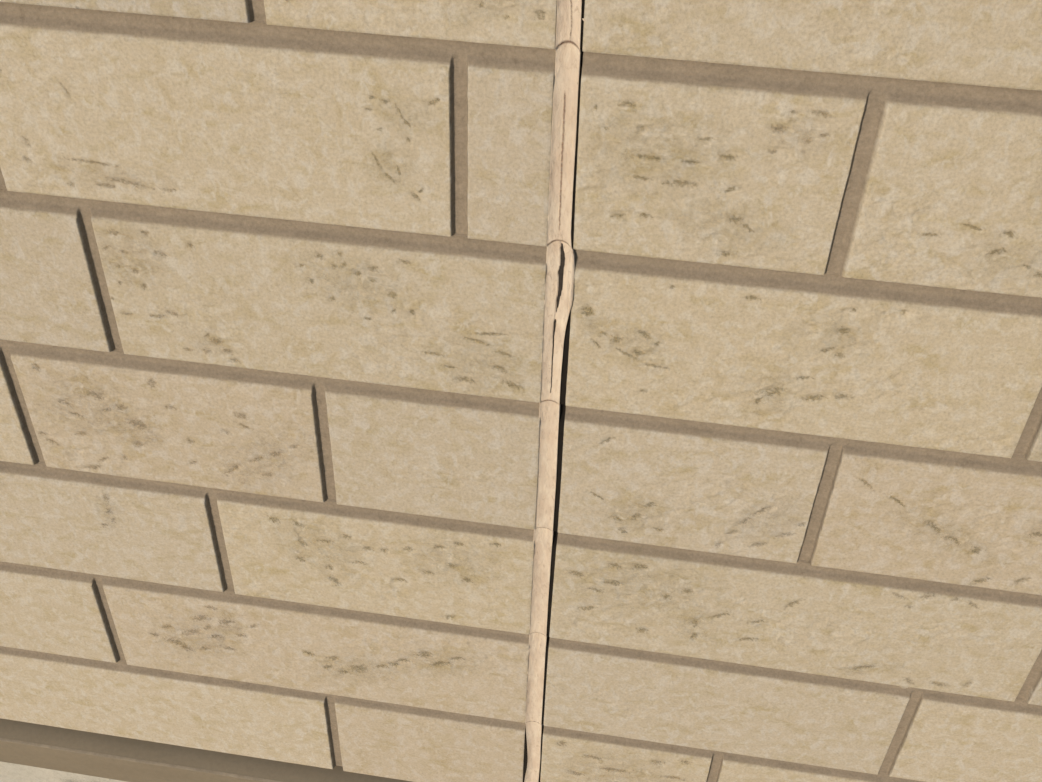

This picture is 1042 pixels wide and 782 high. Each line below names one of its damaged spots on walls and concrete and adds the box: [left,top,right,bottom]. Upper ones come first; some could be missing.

crack [523,0,585,782]